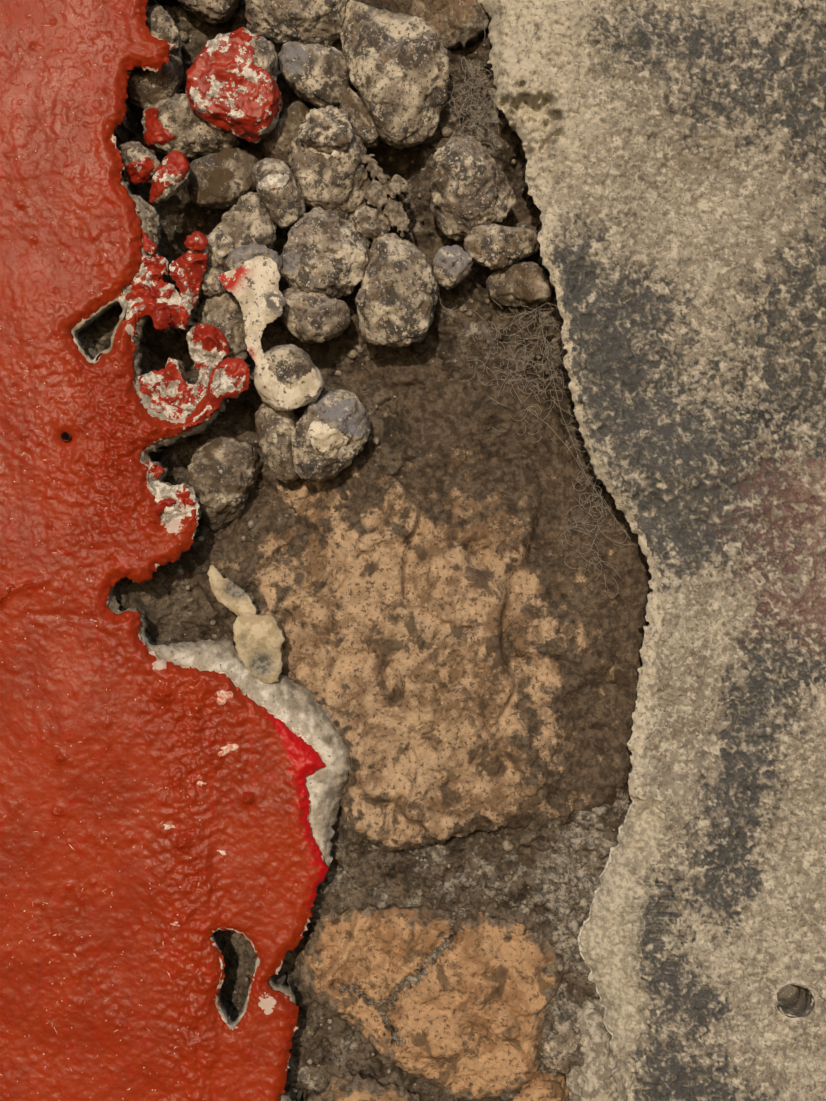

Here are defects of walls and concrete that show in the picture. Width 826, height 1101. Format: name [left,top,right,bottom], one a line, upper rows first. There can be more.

spalling [160,0,251,94]
spalling [78,20,591,647]
peeling [217,690,233,705]
peeling [218,744,238,756]
spalling [219,930,256,1012]
crack [329,903,469,1048]
spalling [279,770,630,1101]